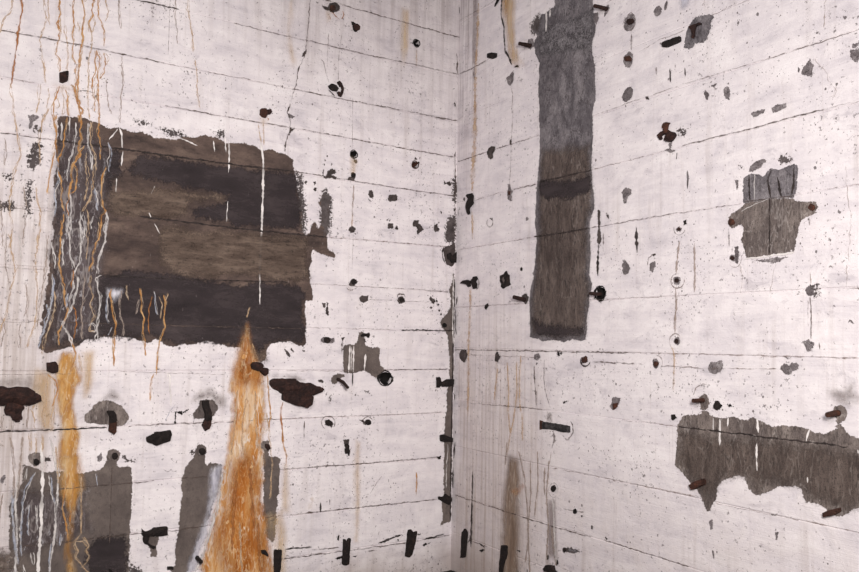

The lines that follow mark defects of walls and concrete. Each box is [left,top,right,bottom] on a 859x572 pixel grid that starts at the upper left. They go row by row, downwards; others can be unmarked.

corrosion [0,0,23,84]
water stain [0,123,109,348]
corrosion [39,0,108,509]
crack [2,0,177,65]
crack [1,133,454,196]
crack [188,0,525,162]
crack [517,205,725,241]
crack [683,104,842,146]
peeling [728,153,818,264]
corrosion [105,288,168,399]
water stain [0,397,89,572]
corrosion [189,336,287,572]